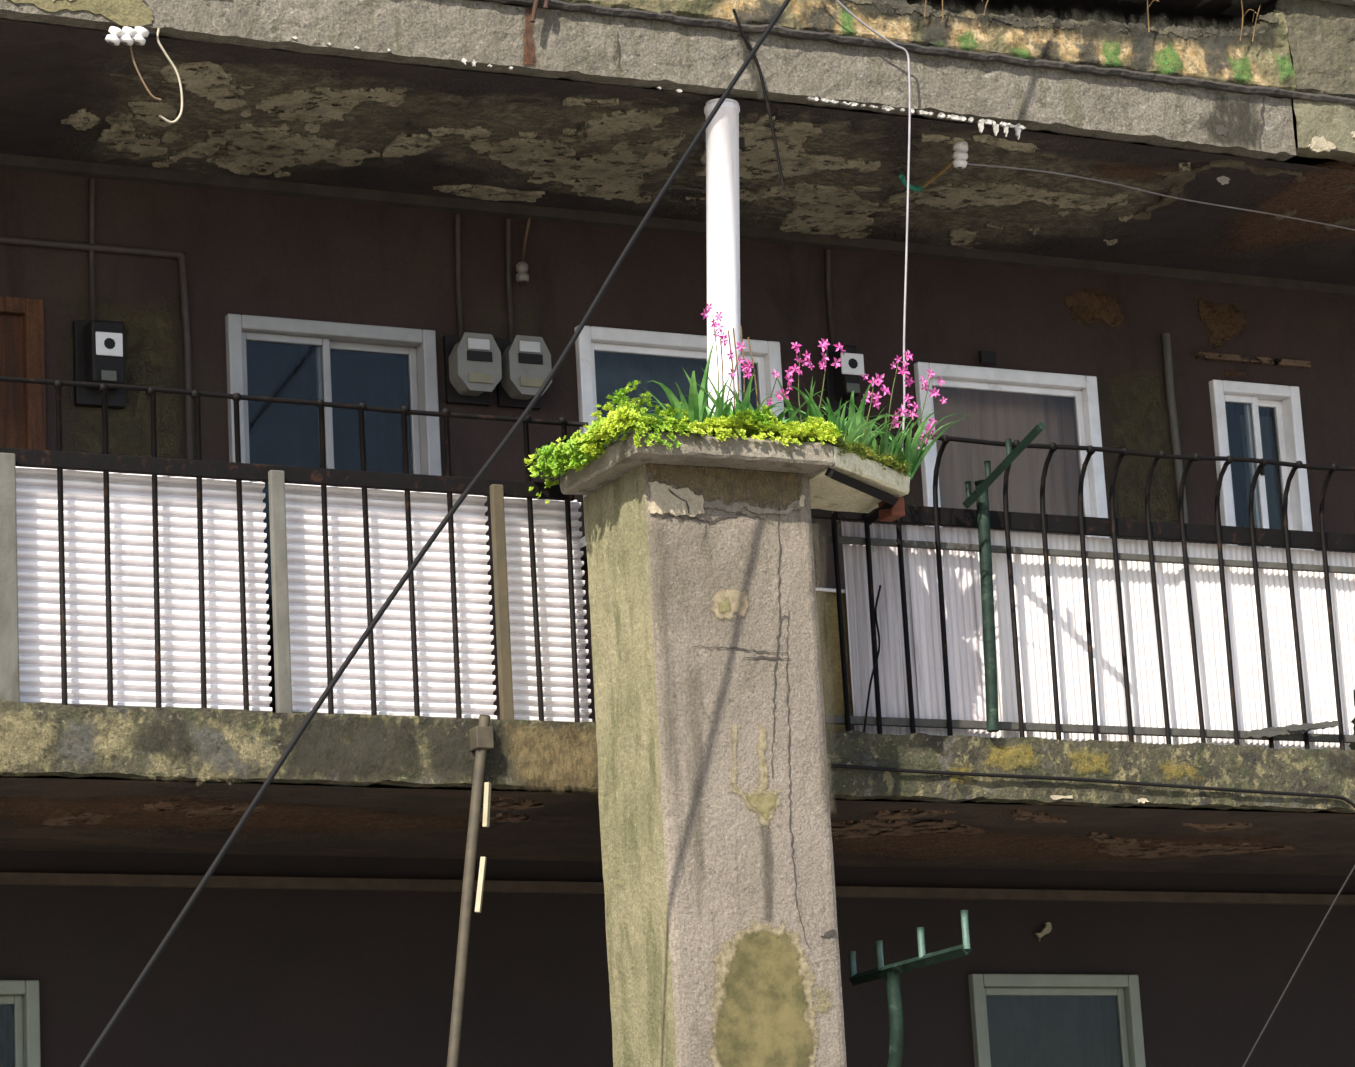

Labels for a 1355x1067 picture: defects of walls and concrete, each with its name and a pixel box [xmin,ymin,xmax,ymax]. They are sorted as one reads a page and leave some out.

peeling [10,0,154,28]
rust [523,7,535,65]
water stain [737,0,783,98]
spalling [780,0,1291,87]
water stain [802,0,1275,74]
peeling [61,55,706,207]
peeling [739,97,1305,249]
water stain [1206,96,1257,145]
water stain [0,712,56,770]
water stain [93,710,503,781]
crack [656,494,836,947]
spalling [709,920,819,1067]